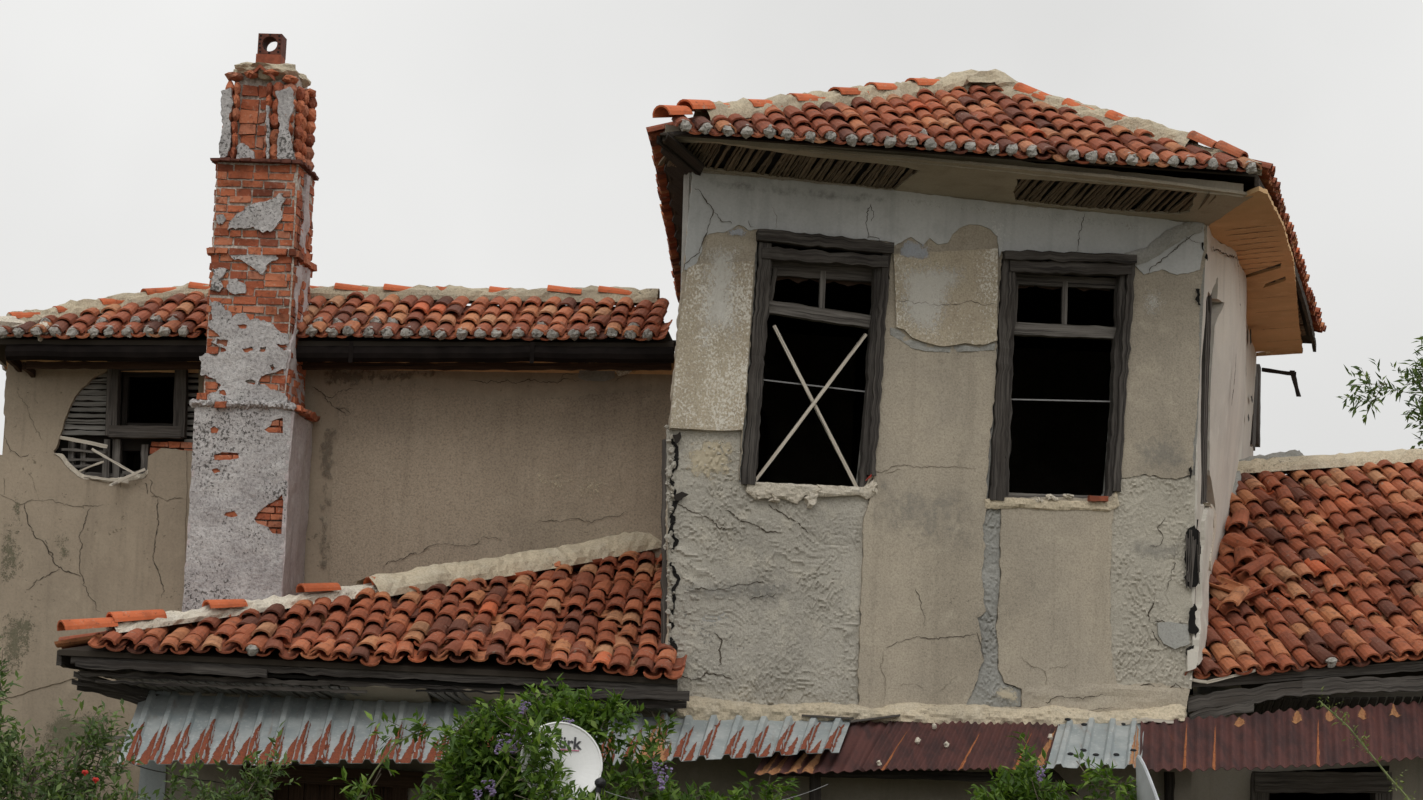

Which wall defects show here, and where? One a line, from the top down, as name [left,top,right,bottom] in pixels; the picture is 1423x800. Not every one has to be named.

peeling [219,87,295,160]
peeling [54,174,311,486]
flaking render [890,248,998,353]
crack [0,394,103,612]
crack [145,480,180,594]
flaking render [660,261,754,657]
crack [678,504,807,533]
crack [681,633,731,680]
crack [689,580,776,600]
crack [880,590,983,695]
corrosion [1012,729,1056,770]
corrosion [1292,710,1335,767]